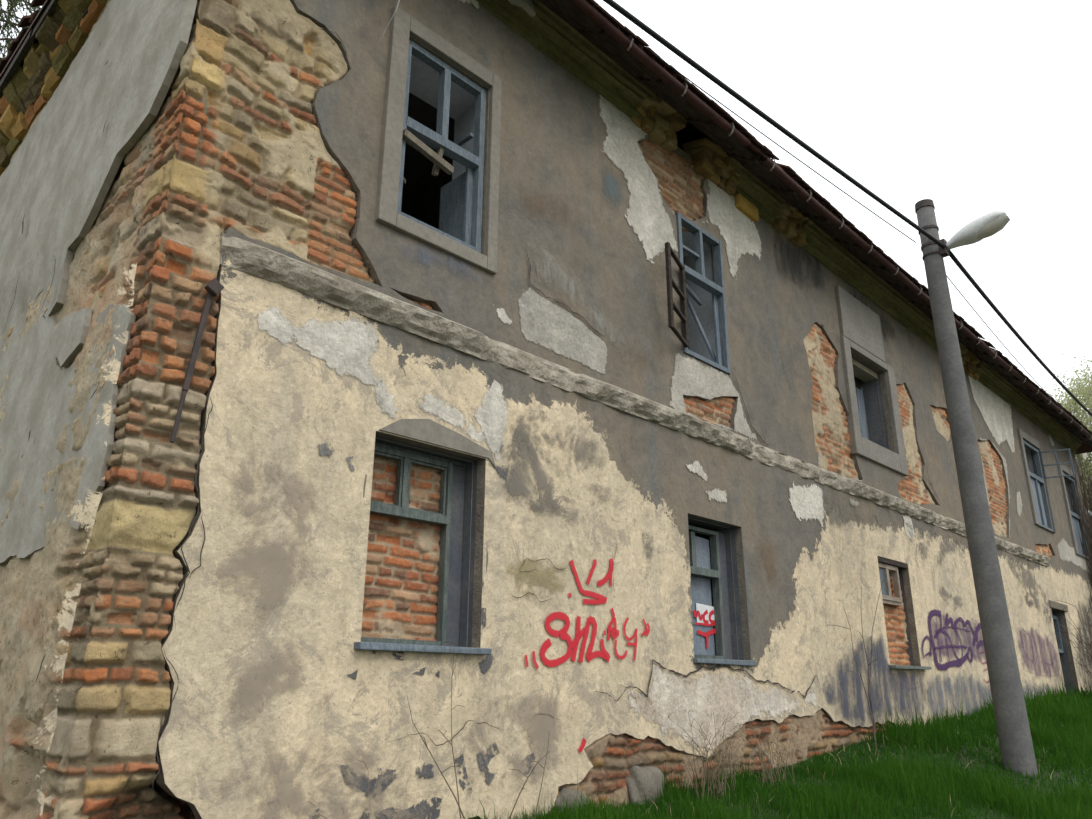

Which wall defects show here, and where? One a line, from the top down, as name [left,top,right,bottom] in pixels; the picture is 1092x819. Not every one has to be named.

flaking render [599,95,762,280]
peeling [0,0,707,819]
flaking render [686,460,727,503]
flaking render [670,353,763,444]
flaking render [789,481,825,529]
flaking render [803,324,862,483]
flaking render [896,384,935,505]
flaking render [931,406,951,441]
crack [151,377,215,795]
crack [597,660,824,706]
peeling [626,510,992,777]
peeling [998,538,1092,699]